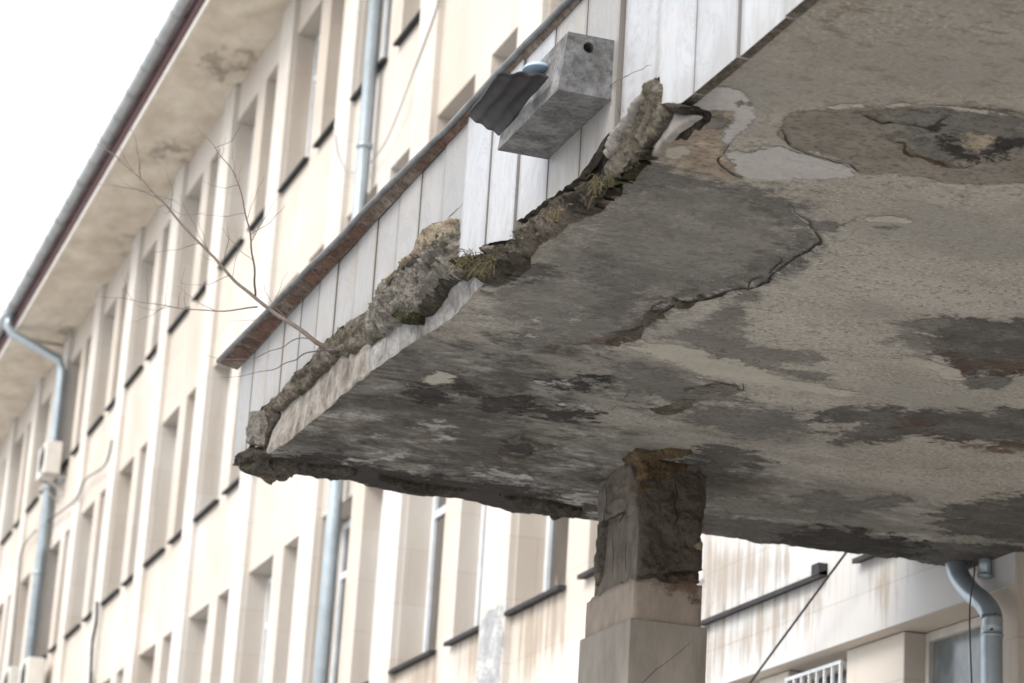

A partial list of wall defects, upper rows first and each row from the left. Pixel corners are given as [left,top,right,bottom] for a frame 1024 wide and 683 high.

peeling [823,102,1010,116]
spalling [234,79,871,485]
leakage [270,158,1024,521]
crack [638,204,853,328]
spalling [378,475,466,496]
spalling [498,494,582,520]
spalling [594,464,707,587]
leakage [702,490,1024,569]